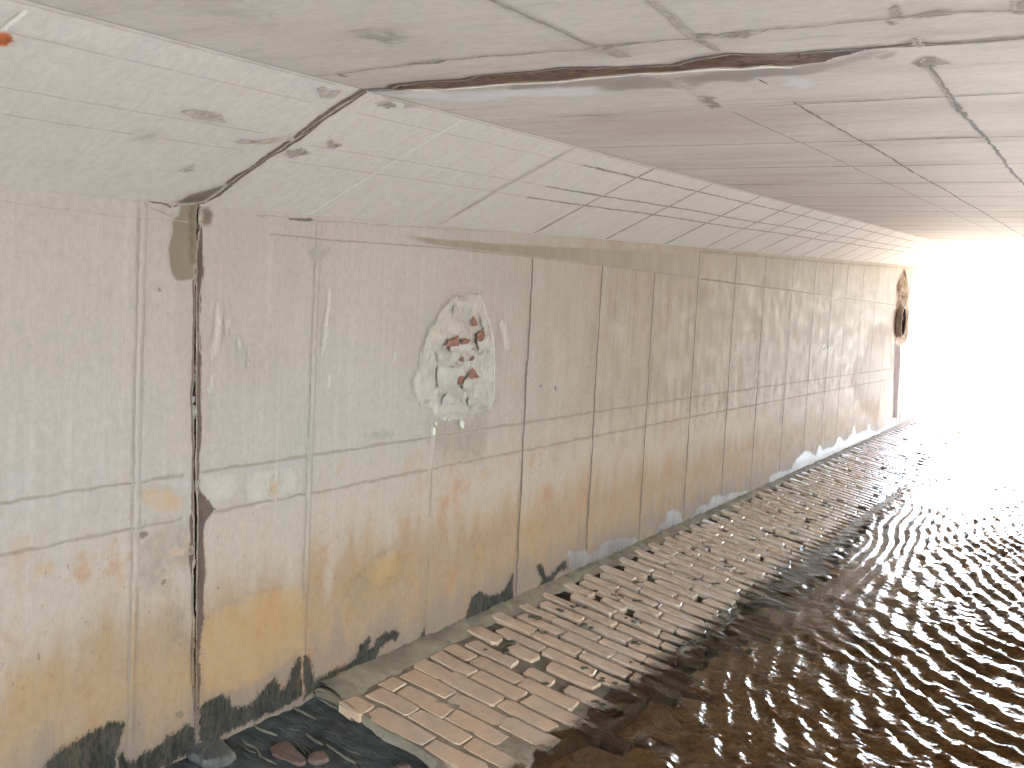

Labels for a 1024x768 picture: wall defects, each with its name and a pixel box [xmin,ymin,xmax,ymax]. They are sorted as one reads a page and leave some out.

crack [2,0,1024,244]
spalling [412,290,496,436]
crack [190,264,202,741]
leakage [566,534,638,572]
leakage [656,489,755,534]